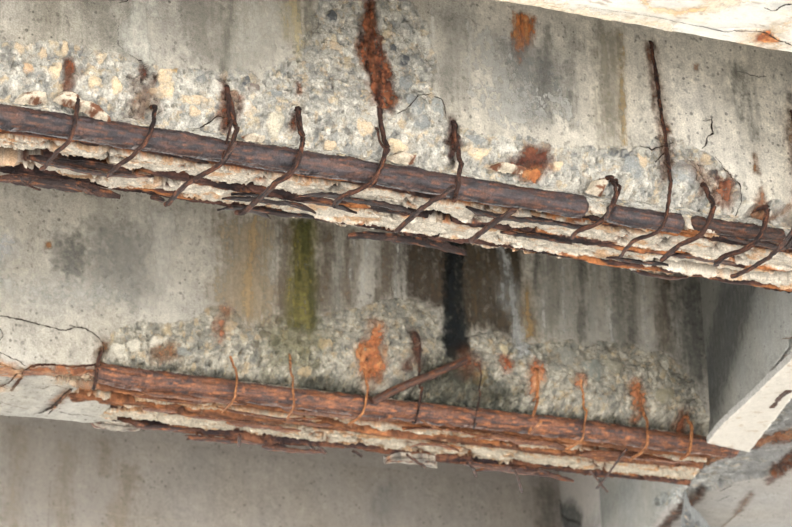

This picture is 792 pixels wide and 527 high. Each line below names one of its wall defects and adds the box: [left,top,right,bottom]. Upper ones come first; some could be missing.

rust [355,0,398,111]
crack [596,8,792,46]
damp [212,215,369,327]
rust [217,192,414,220]
spalling [0,0,792,293]
rust [465,206,589,245]
rust [510,145,553,183]
crack [702,119,742,215]
crack [0,315,104,417]
damp [231,367,360,395]
spalling [55,298,792,507]
damp [375,236,674,430]